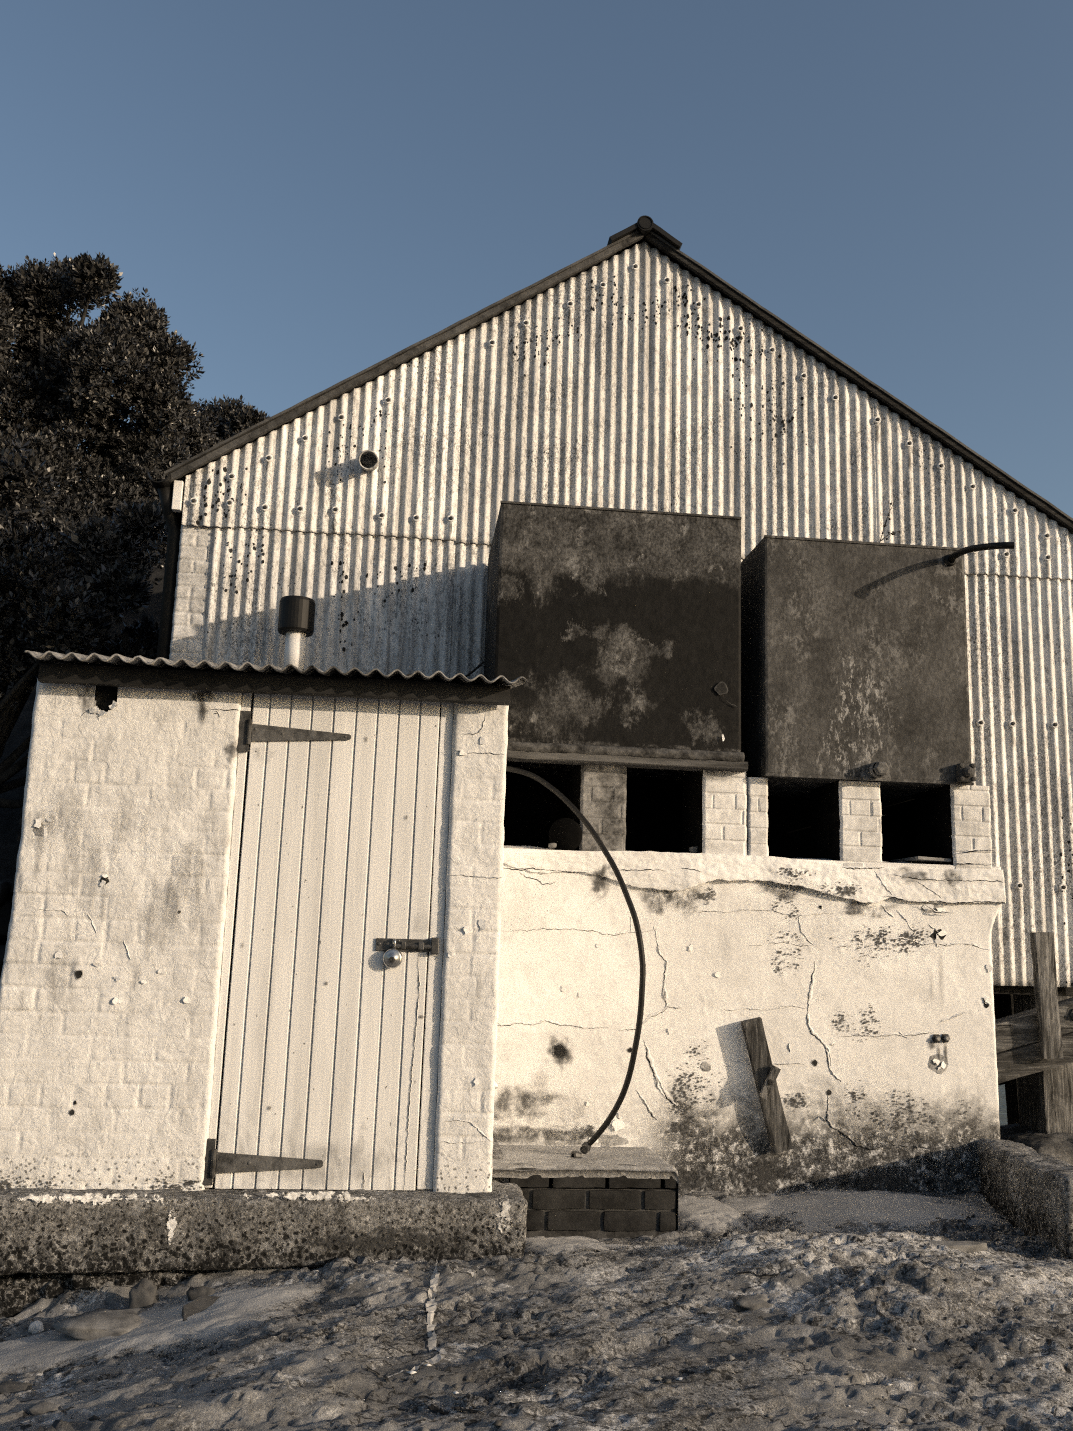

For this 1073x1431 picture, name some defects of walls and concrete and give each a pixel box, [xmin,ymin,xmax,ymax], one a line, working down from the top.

crack [621,866,701,874]
crack [845,849,1002,950]
spalling [921,903,946,913]
peeling [930,929,947,944]
crack [497,916,682,1120]
crack [698,909,964,1158]
leakage [575,1125,595,1139]